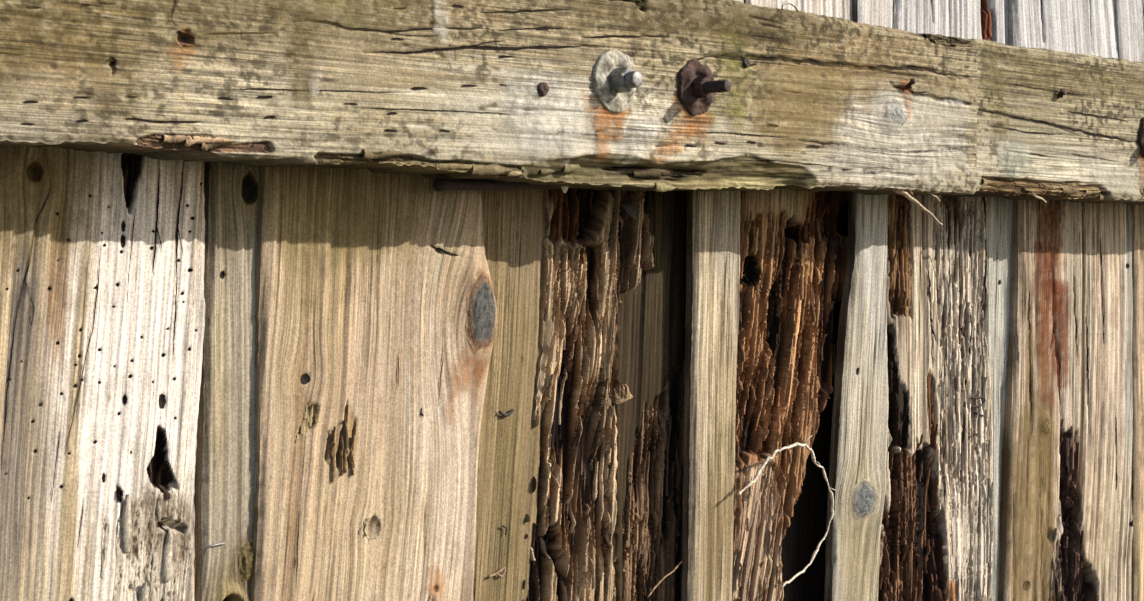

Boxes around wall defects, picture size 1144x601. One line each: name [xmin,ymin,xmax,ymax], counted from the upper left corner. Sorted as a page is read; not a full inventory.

crack [80,0,114,8]
crack [751,16,782,28]
crack [1037,0,1045,36]
crack [171,0,671,132]
crack [21,100,38,125]
crack [74,96,89,122]
crack [687,55,1134,162]
crack [555,124,970,177]
spalling [887,331,910,449]
spalling [927,371,935,446]
spalling [534,516,568,601]